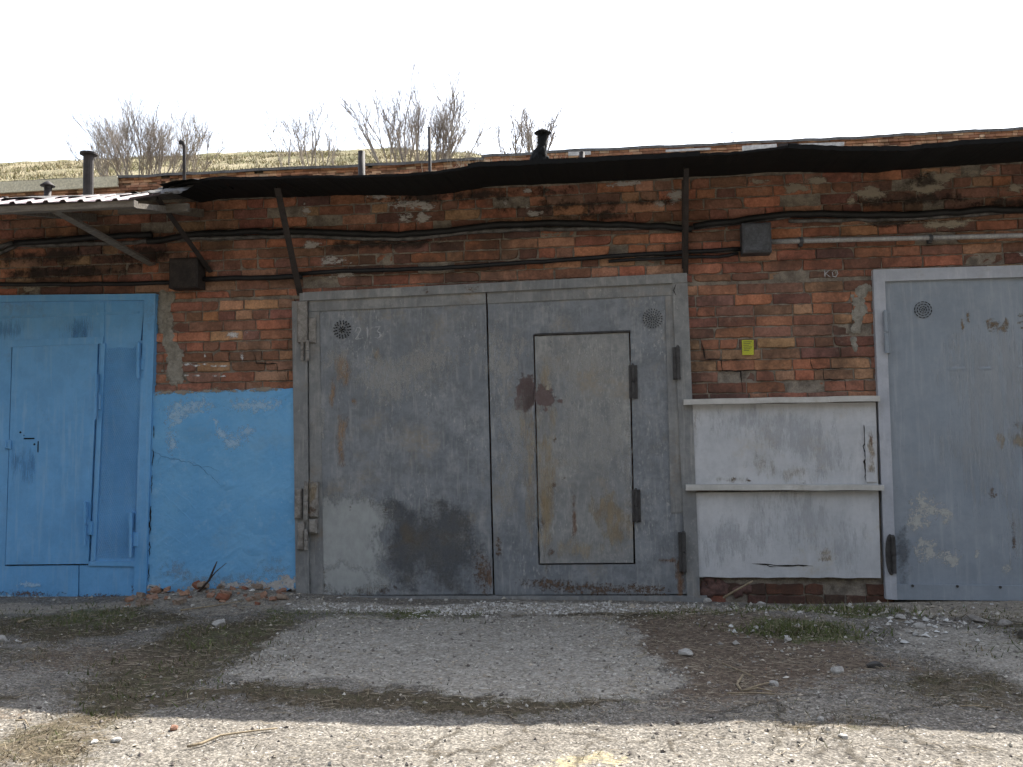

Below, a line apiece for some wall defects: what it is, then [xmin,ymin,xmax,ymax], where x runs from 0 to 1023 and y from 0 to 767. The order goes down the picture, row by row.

crack [148,426,218,590]
water stain [322,492,492,595]
rust [519,554,683,596]